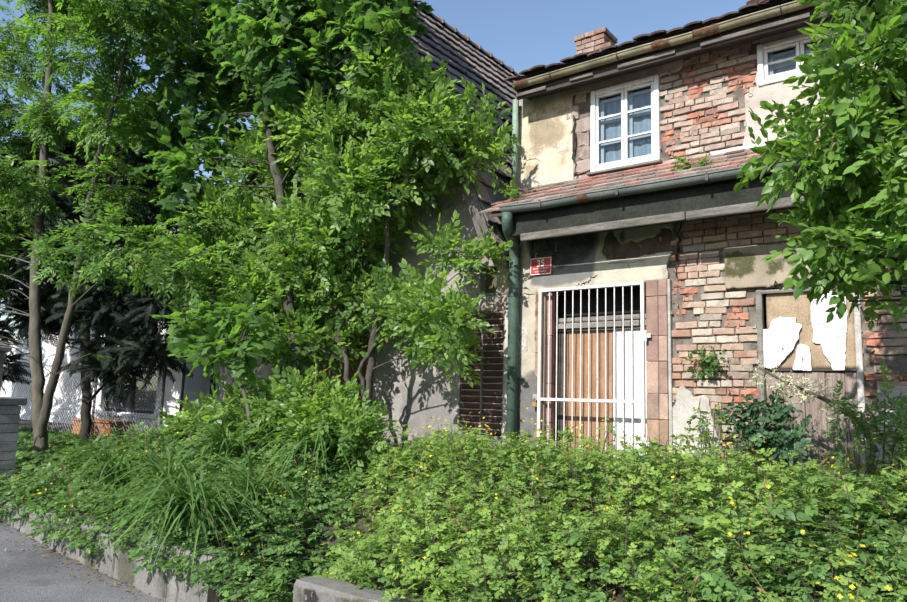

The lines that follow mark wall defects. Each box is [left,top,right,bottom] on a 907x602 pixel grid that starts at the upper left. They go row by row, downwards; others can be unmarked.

spalling [659,40,760,164]
spalling [603,208,810,462]
spalling [853,251,907,401]